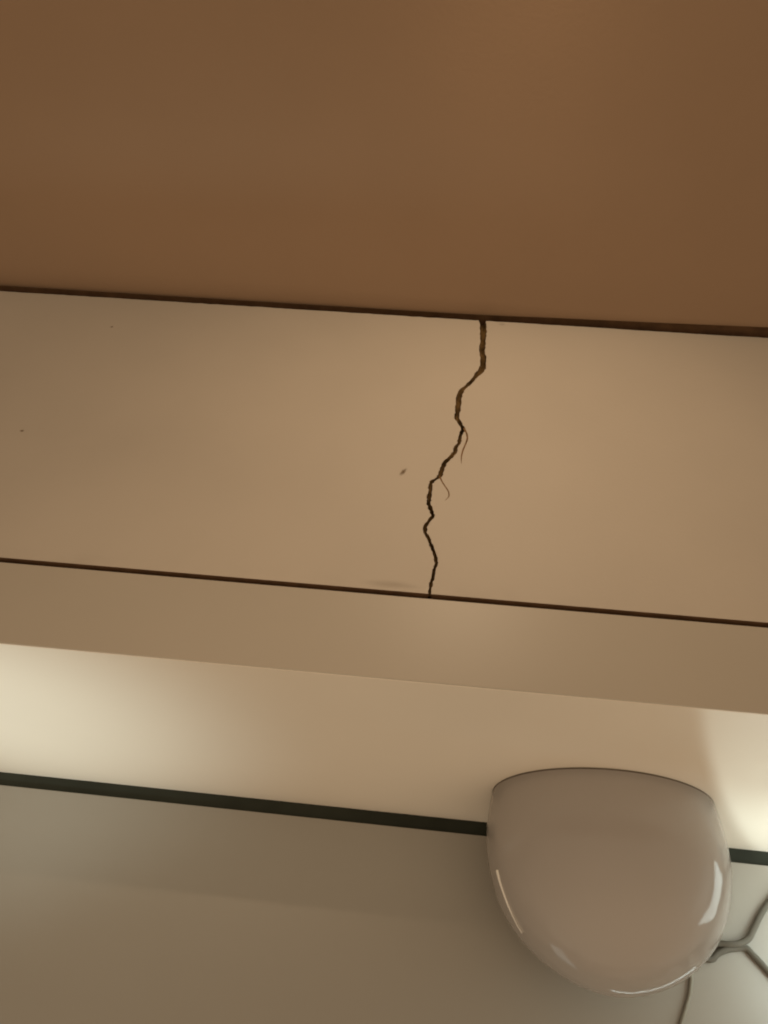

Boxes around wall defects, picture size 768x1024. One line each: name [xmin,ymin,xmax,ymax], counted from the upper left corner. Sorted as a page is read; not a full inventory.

crack [423,322,487,596]